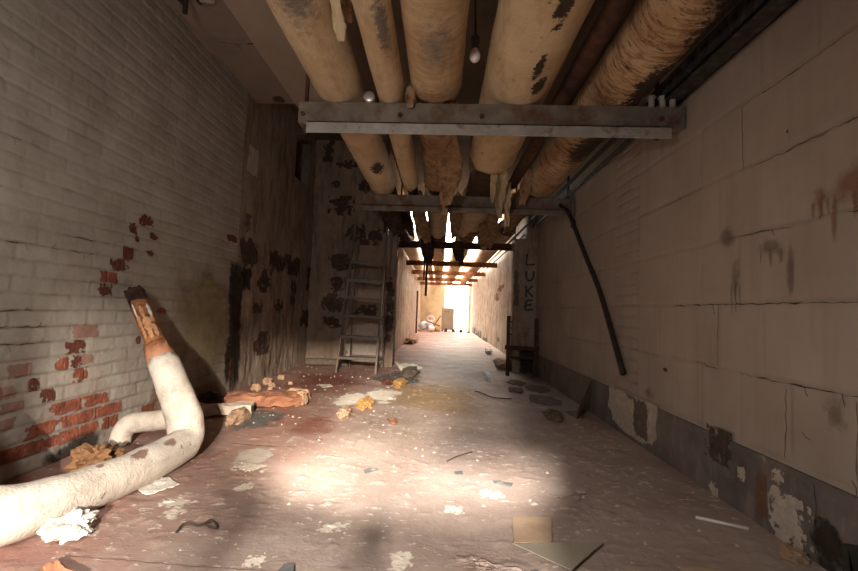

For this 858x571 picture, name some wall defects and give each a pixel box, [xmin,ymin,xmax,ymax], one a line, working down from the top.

crack [741,26,858,166]
peeling [97,214,158,296]
peeling [55,324,99,383]
damp [344,323,386,360]
crack [677,301,855,369]
peeling [0,363,122,466]
peeling [608,386,658,446]
peeling [705,423,745,482]
peeling [768,468,814,553]